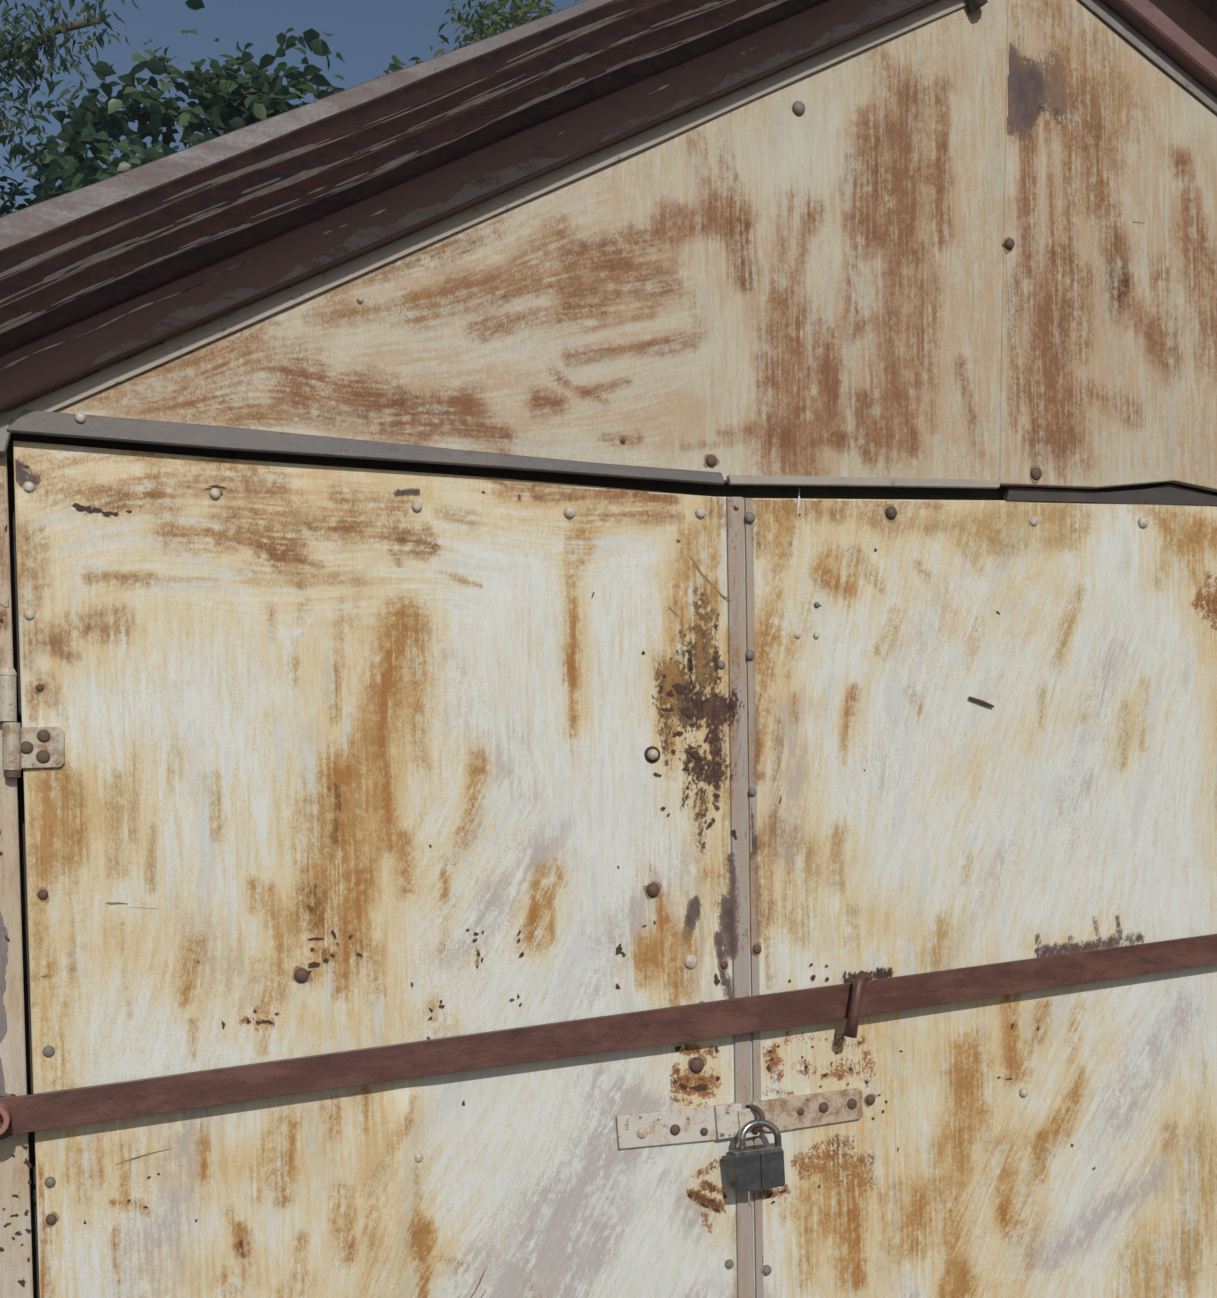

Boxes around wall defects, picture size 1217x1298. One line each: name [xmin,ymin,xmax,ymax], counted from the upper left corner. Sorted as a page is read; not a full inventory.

peeling [0,154,574,371]
peeling [0,0,787,334]
corrosion [722,82,951,476]
corrosion [1003,1,1179,485]
corrosion [652,499,796,852]
corrosion [249,604,425,1018]
peeling [0,911,16,1097]
corrosion [616,881,701,1006]
corrosion [670,1042,722,1107]
corrosion [763,1031,888,1120]
corrosion [687,1157,727,1233]
corrosion [758,1133,882,1290]